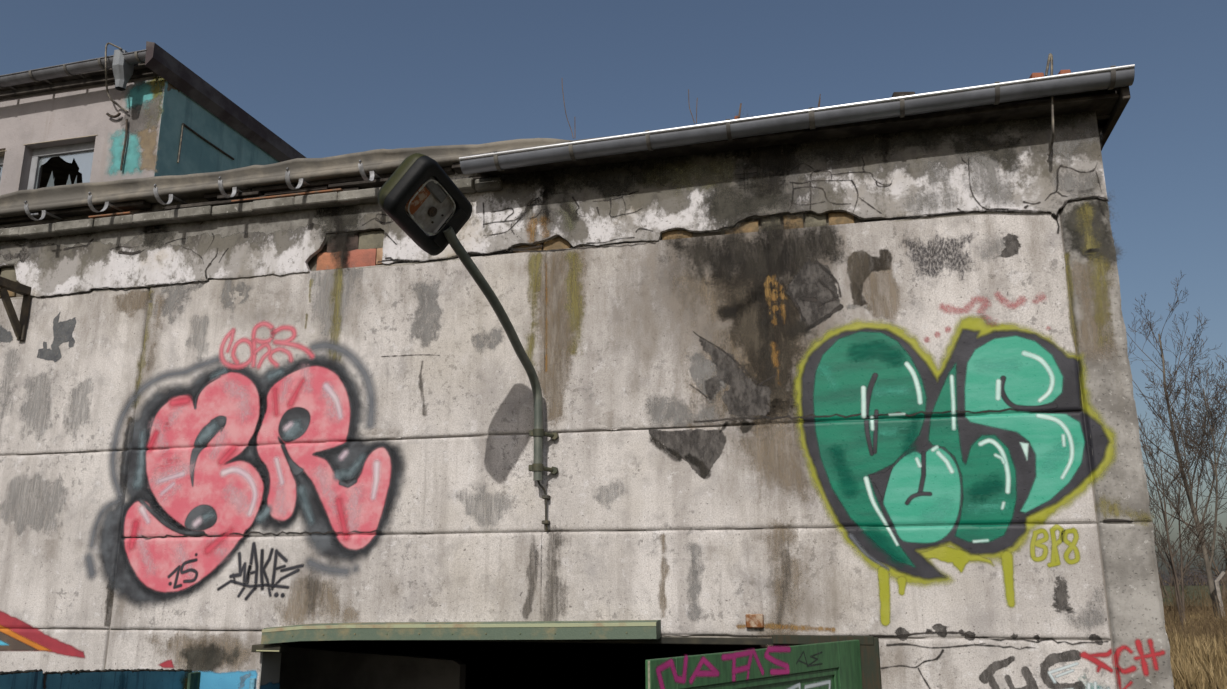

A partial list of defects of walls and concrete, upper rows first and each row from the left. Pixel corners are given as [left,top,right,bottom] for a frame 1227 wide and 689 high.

crack [790,154,1109,234]
spalling [509,236,588,254]
spalling [660,212,866,240]
corrosion [764,276,785,322]